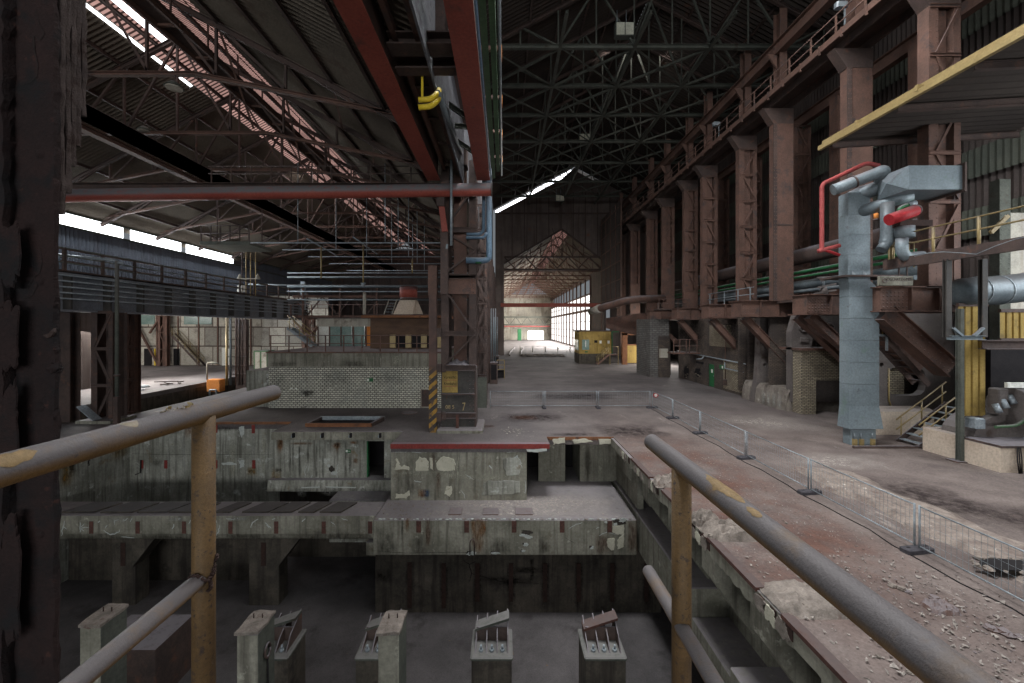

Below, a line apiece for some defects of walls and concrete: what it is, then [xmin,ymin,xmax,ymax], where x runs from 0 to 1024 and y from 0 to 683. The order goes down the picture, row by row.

peeling [395,452,456,471]
peeling [482,437,671,495]
spalling [692,508,757,551]